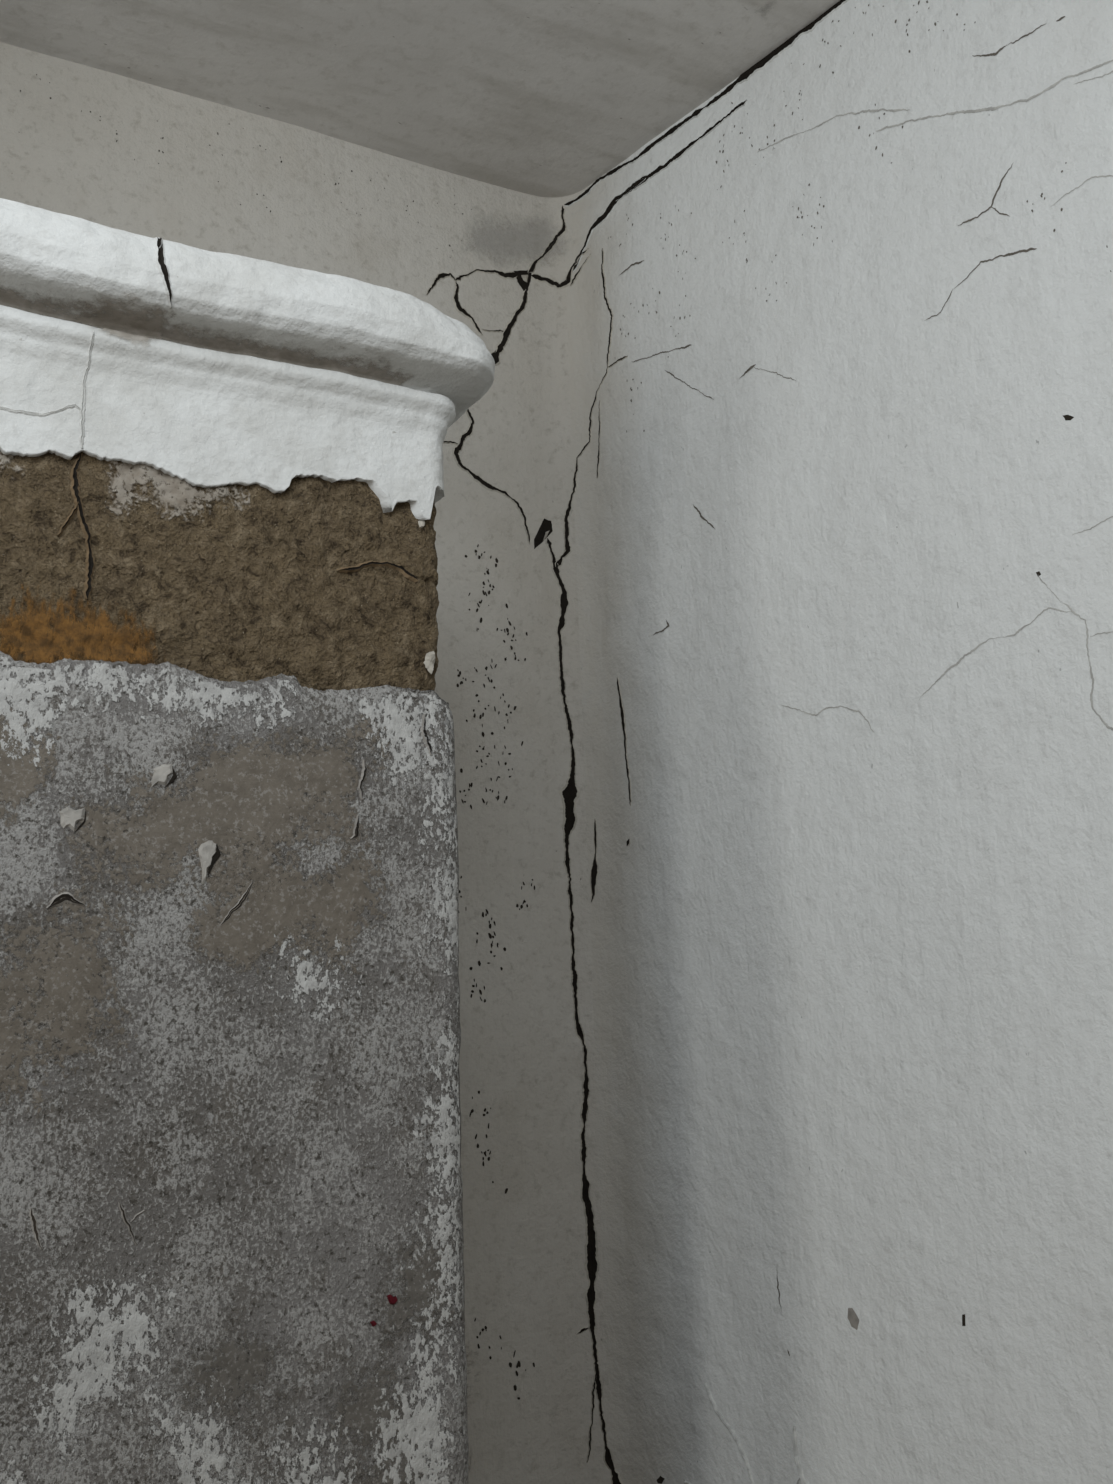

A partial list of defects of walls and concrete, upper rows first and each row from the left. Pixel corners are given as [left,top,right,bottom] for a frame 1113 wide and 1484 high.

crack [972,16,1065,57]
crack [758,60,1113,152]
crack [958,165,1012,226]
crack [1053,175,1113,205]
crack [154,237,173,309]
crack [926,248,1037,320]
rust [0,586,165,665]
crack [919,575,1113,730]
crack [426,0,849,1484]
crack [782,705,874,732]
flaking render [0,451,535,1484]